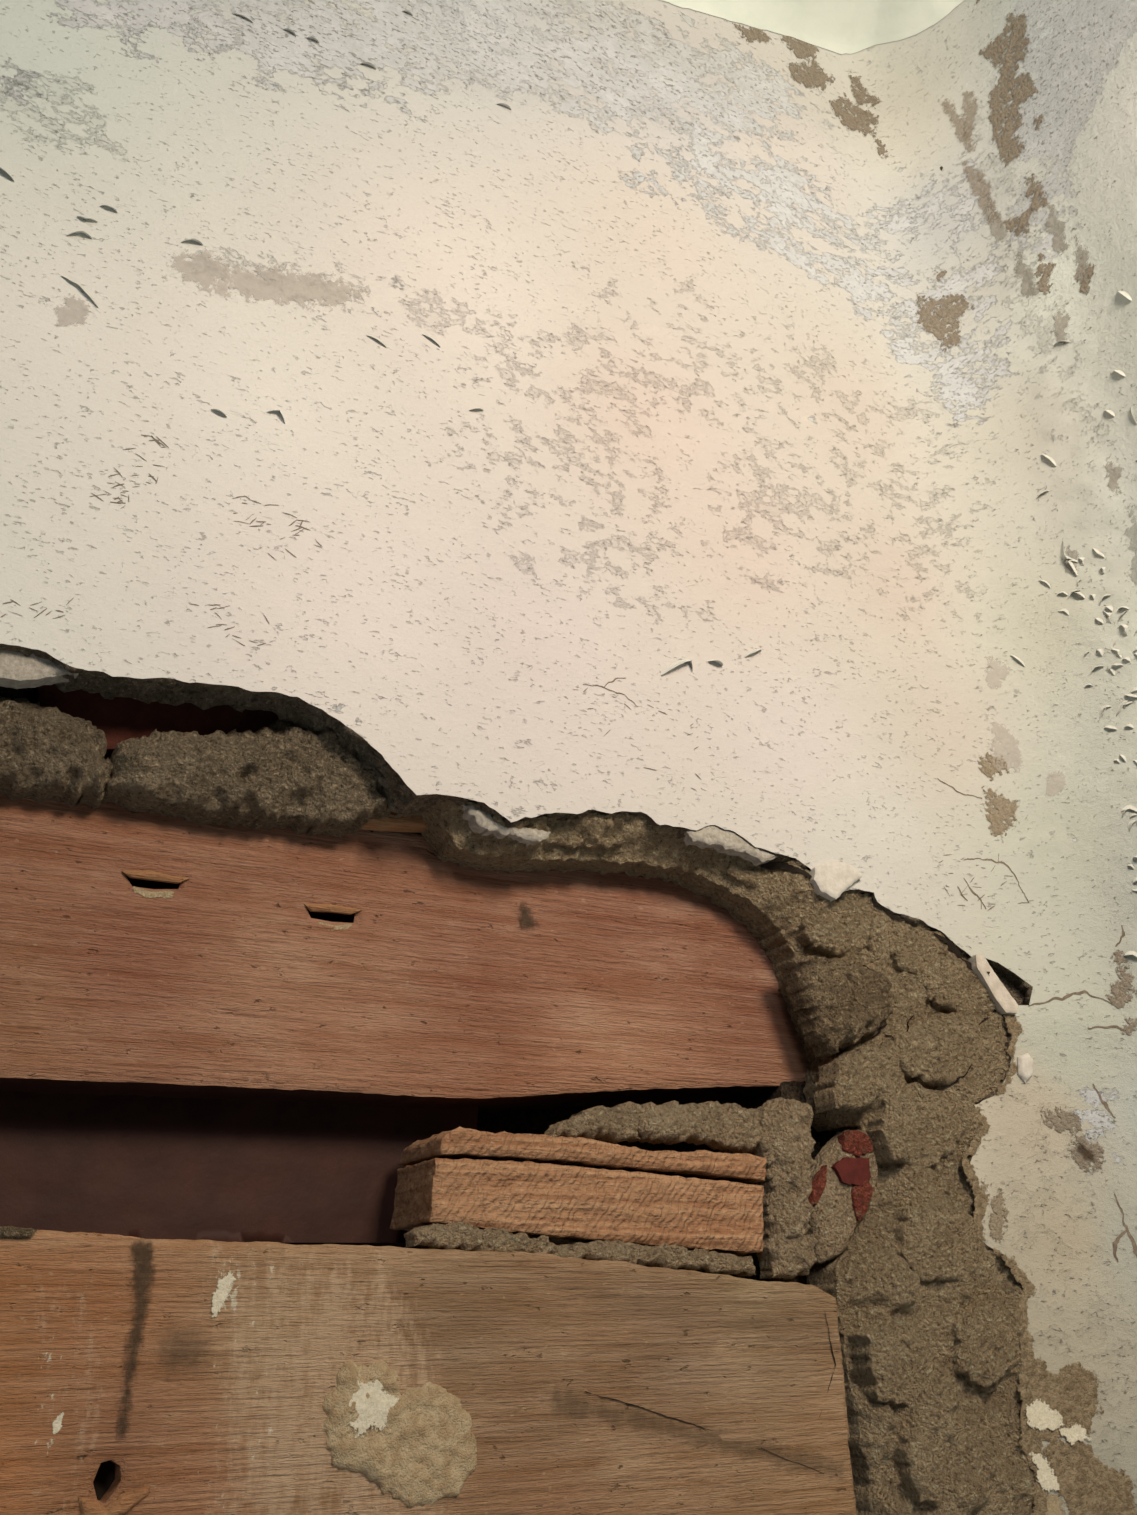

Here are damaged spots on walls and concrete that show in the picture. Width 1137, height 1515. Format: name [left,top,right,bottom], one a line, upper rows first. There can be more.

spalling [732,23,889,158]
spalling [942,10,1096,345]
spalling [915,270,975,352]
peeling [1103,461,1137,585]
peeling [0,650,79,689]
peeling [1039,539,1137,687]
peeling [1099,687,1137,730]
spalling [937,714,1021,843]
spalling [395,798,1137,1515]